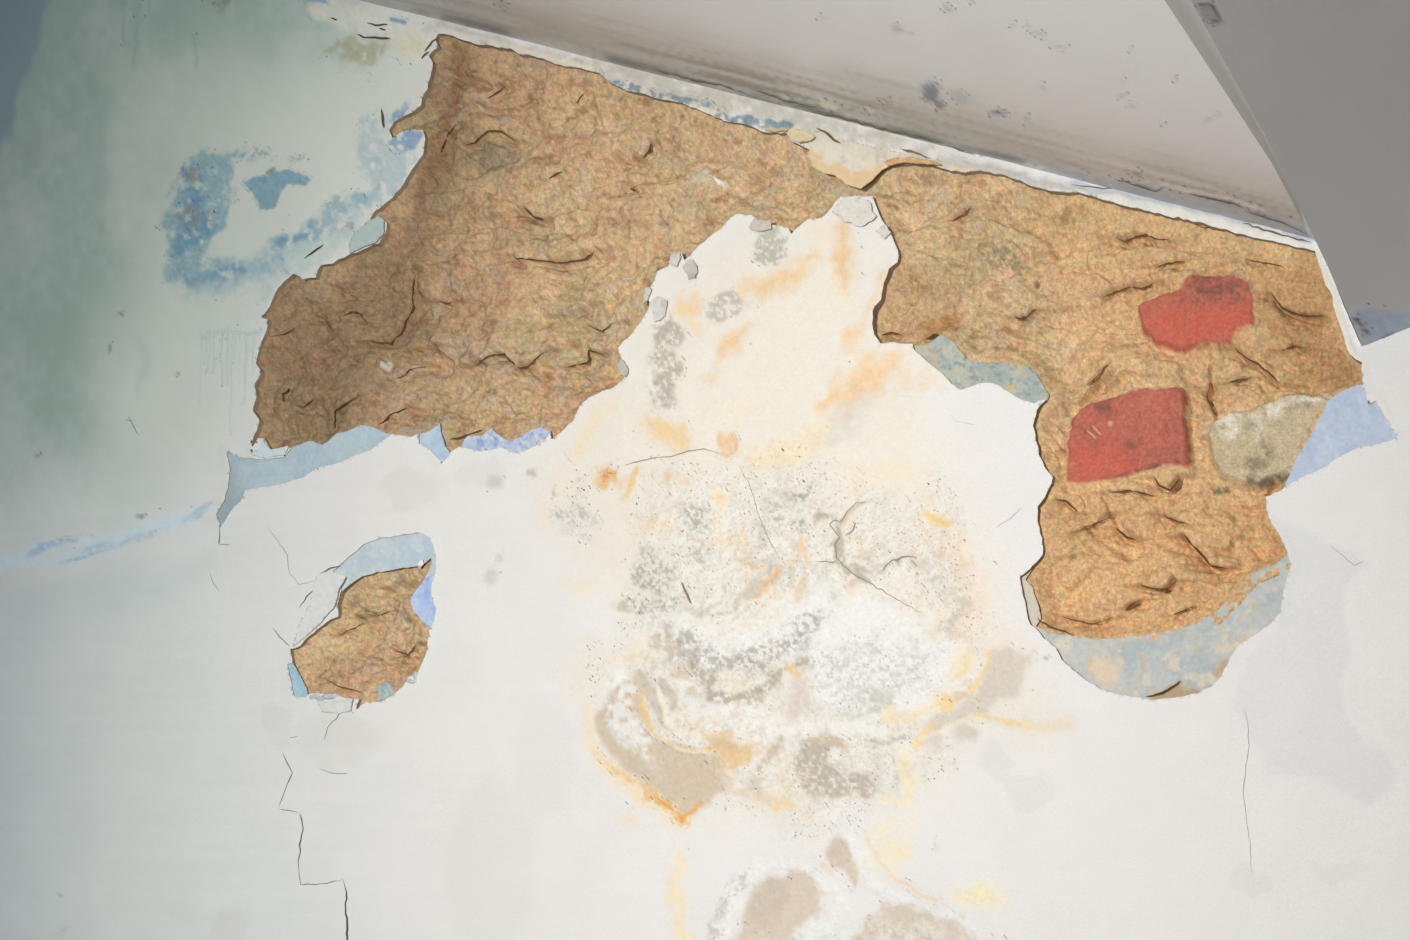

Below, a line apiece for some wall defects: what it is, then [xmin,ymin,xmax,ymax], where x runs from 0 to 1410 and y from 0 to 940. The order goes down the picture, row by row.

crack [279,711,353,940]
flaking render [155,0,1410,721]
water stain [497,202,1081,940]